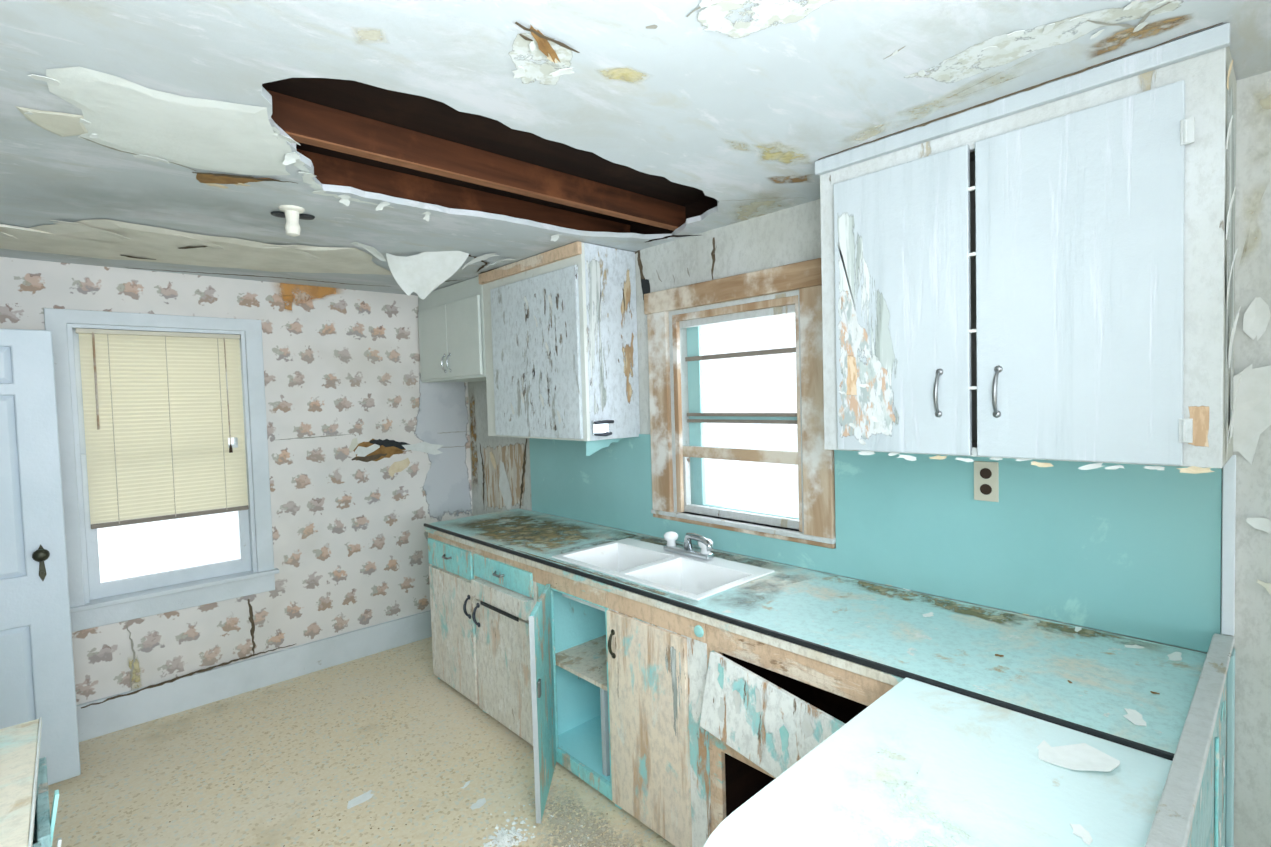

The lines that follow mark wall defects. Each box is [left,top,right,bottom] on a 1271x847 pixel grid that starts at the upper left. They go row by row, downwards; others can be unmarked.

peeling [509,22,580,85]
peeling [686,0,833,39]
peeling [905,0,1182,83]
peeling [15,66,394,211]
hole [349,438,443,477]
crack [81,599,295,709]